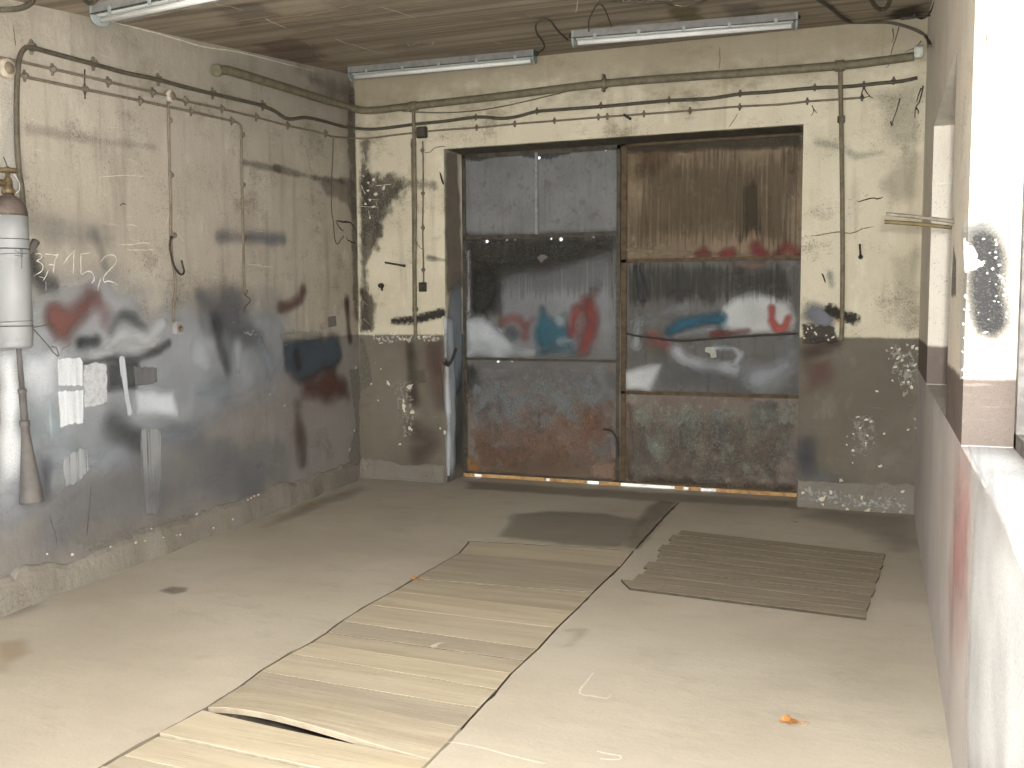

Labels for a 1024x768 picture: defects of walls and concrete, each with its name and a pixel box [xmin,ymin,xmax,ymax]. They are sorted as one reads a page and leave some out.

peeling [801,479,907,513]